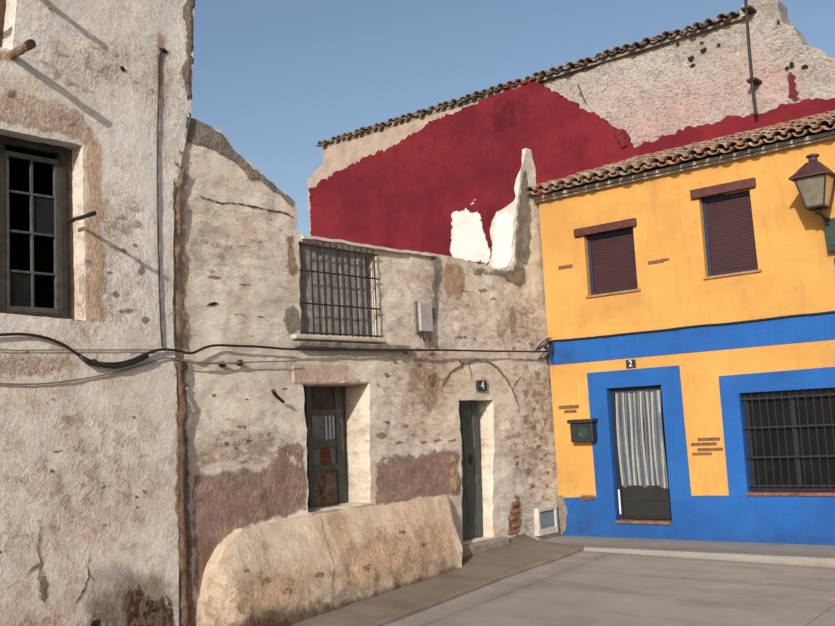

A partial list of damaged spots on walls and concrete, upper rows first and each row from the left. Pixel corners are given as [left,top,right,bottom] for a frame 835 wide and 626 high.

flaking render [182,0,195,101]
crack [171,179,179,346]
peeling [173,150,190,348]
spalling [185,113,293,205]
crack [200,196,293,217]
flaking render [310,82,512,188]
flaking render [431,170,532,324]
crack [442,358,521,413]
peeling [90,357,307,626]
peeling [375,424,461,505]
crack [26,526,47,602]
crack [75,553,95,603]